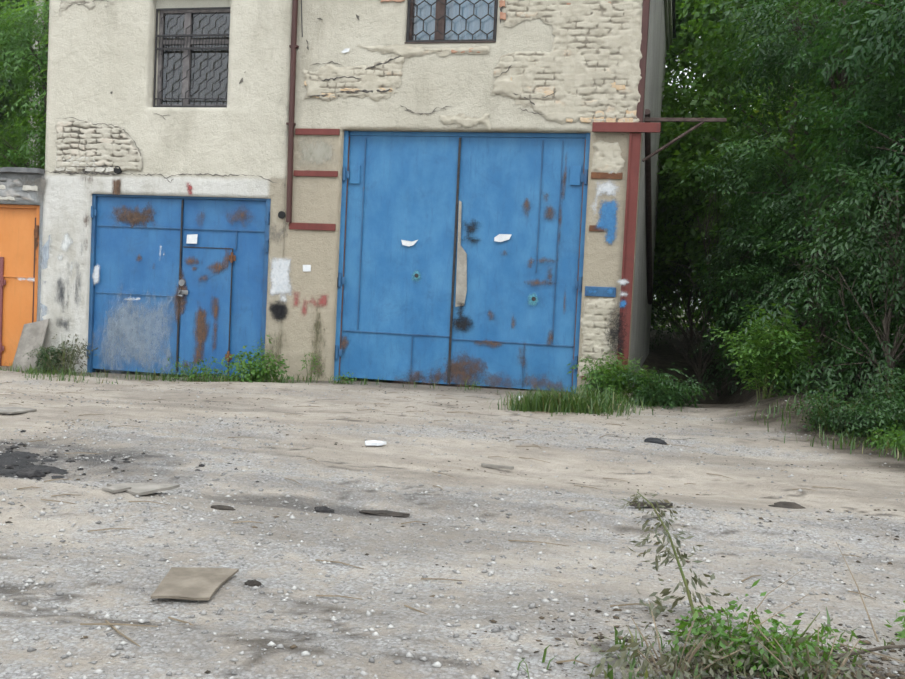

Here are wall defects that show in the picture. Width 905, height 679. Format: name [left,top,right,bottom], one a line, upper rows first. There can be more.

spalling [302,44,490,101]
spalling [490,0,643,126]
spalling [54,118,143,173]
spalling [591,140,625,174]
corrosion [200,251,228,281]
corrosion [174,273,187,320]
corrosion [184,298,219,366]
spalling [578,297,618,382]